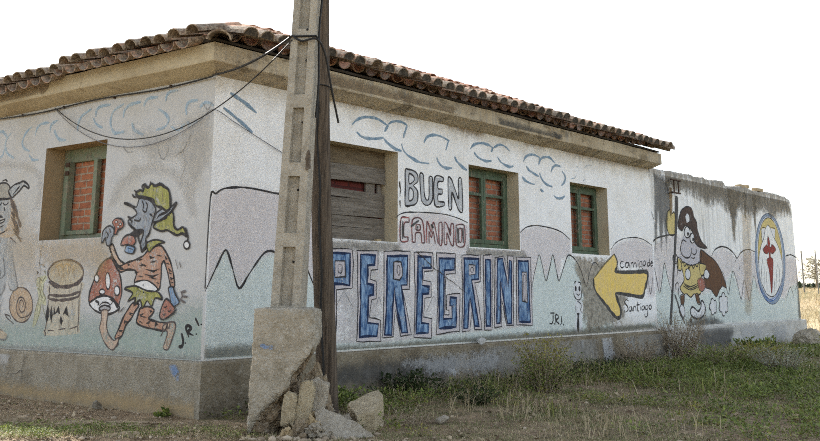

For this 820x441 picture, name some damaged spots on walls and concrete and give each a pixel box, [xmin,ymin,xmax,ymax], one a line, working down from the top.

water stain [649,174,791,246]
spalling [247,352,313,435]